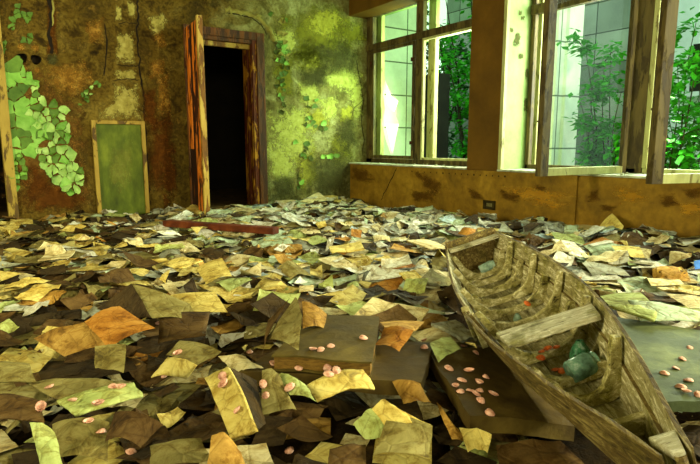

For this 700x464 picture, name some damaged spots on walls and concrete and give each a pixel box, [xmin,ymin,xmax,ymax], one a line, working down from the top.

peeling [8,3,33,30]
peeling [2,33,101,204]
flaking render [103,24,140,119]
flaking render [115,2,135,20]
crack [114,0,151,203]
rust [149,14,166,47]
rust [144,62,177,205]
damp [267,5,371,201]
damp [412,172,439,201]